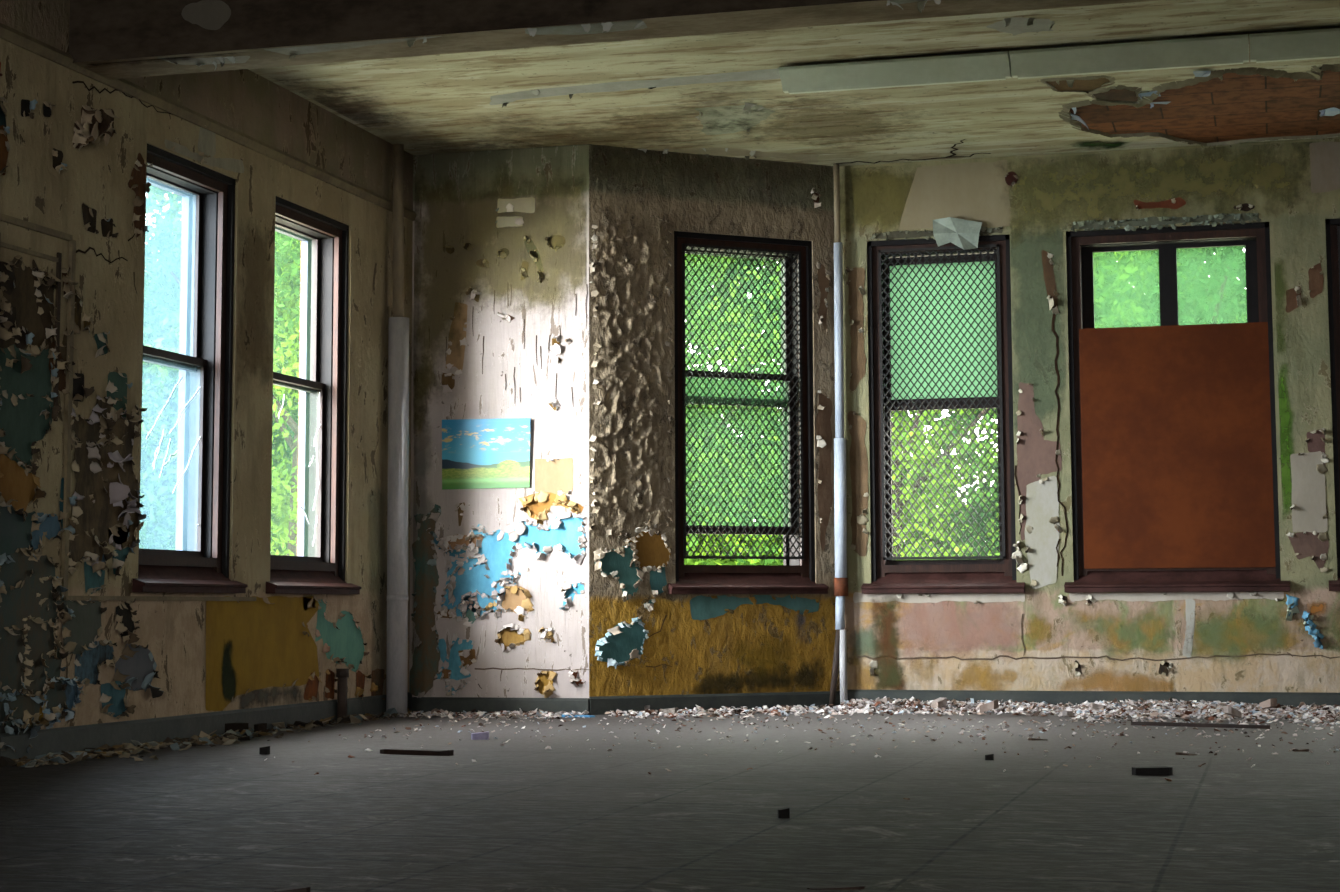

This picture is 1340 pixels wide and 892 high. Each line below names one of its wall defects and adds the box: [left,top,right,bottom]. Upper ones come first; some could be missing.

peeling [52,105,122,174]
peeling [82,153,153,239]
leakage [413,173,587,427]
leakage [1009,142,1312,417]
spalling [1040,64,1340,193]
peeling [0,254,164,754]
peeling [409,197,673,698]
peeling [853,382,1329,676]